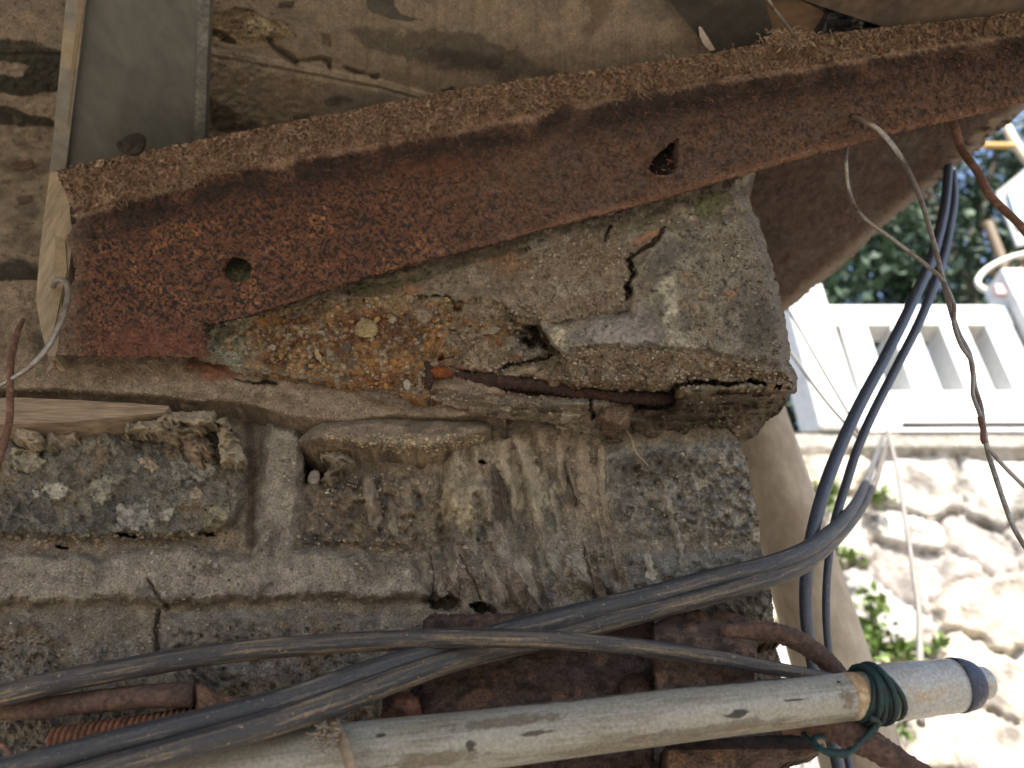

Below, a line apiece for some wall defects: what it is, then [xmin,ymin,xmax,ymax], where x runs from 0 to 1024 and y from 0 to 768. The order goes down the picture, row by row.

crack [624,227,666,299]
spalling [207,231,795,440]
crack [673,380,791,392]
peeling [10,447,47,474]
peeling [32,482,69,500]
peeling [88,475,175,532]
peeling [137,455,231,530]
crack [148,580,169,651]